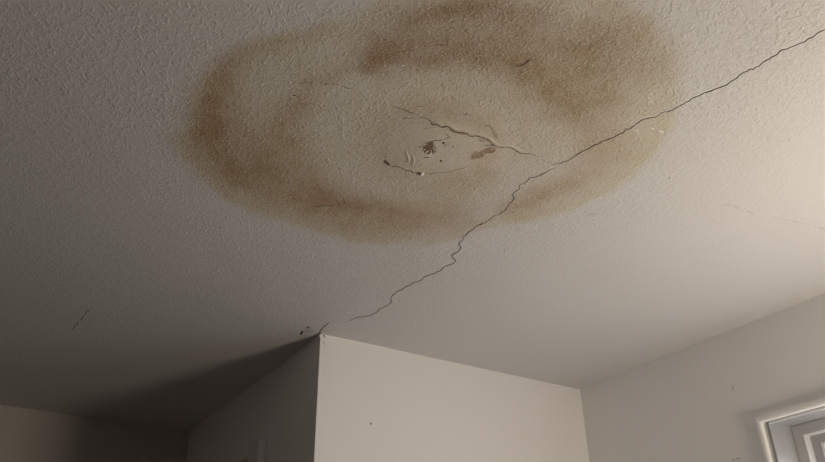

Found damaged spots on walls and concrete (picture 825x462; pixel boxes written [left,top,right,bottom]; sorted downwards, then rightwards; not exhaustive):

water stain [141,0,710,260]
crack [351,28,825,320]